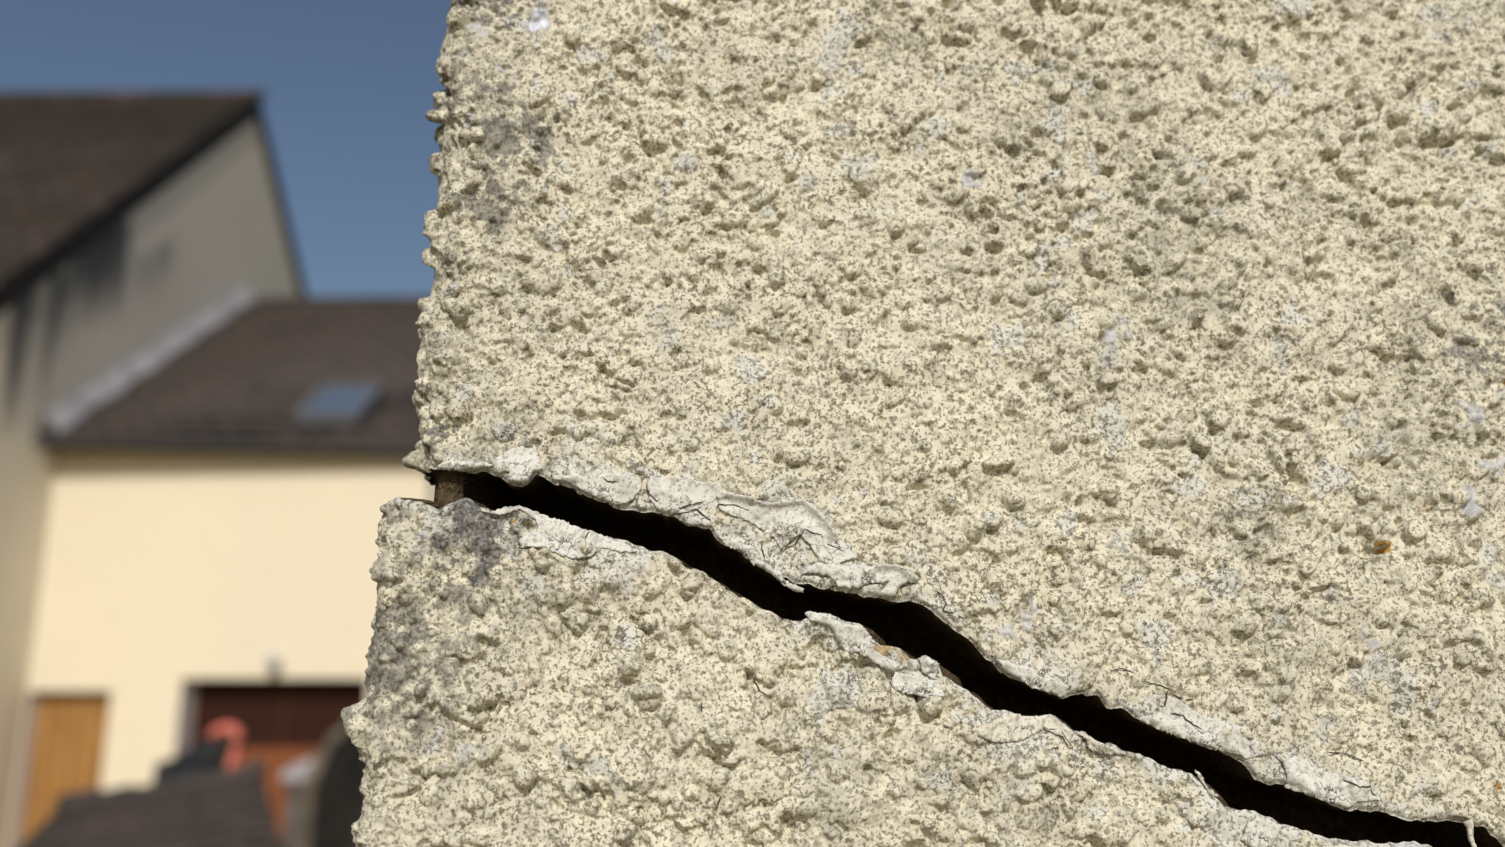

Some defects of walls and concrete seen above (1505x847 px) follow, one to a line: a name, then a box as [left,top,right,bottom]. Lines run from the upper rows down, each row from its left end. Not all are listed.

crack [399,469,1503,847]